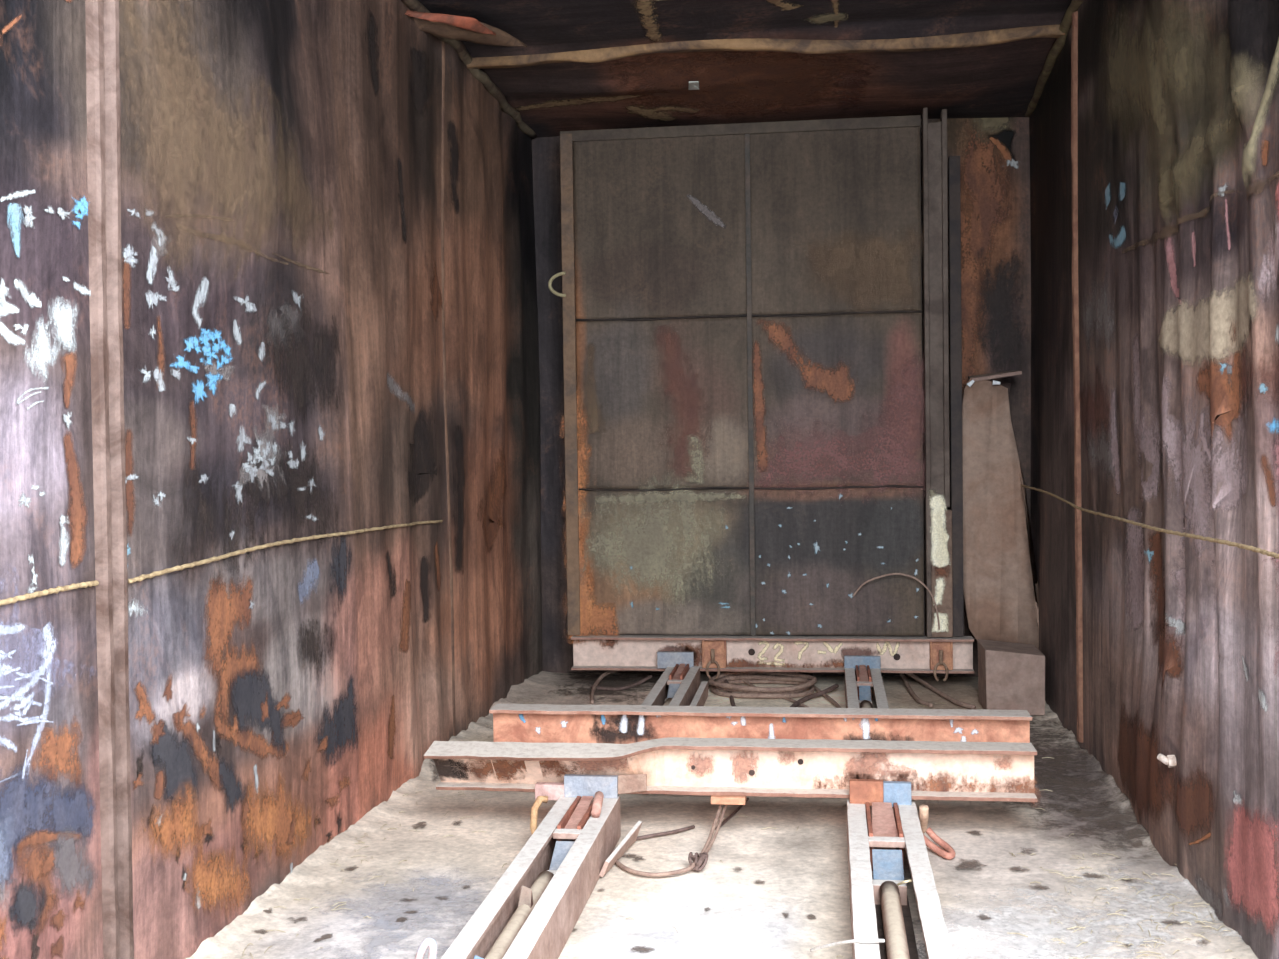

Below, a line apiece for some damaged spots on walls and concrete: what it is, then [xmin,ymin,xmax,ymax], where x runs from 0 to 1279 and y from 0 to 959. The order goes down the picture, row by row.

rust [960,117,1011,392]
rust [757,319,855,402]
rust [64,433,87,567]
rust [561,391,618,648]
peeling [0,768,95,932]
rust [17,830,85,958]
peeling [152,721,198,804]
rust [135,577,303,791]
rust [133,771,316,911]
peeling [219,758,251,812]
peeling [230,668,286,752]
peeling [317,678,358,766]